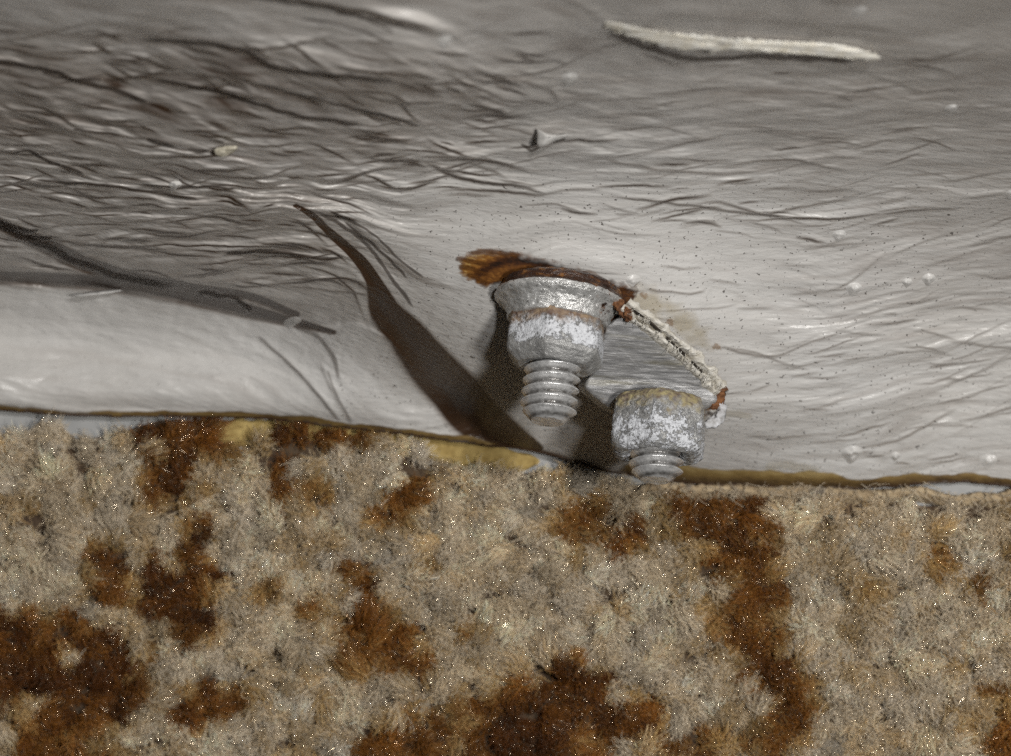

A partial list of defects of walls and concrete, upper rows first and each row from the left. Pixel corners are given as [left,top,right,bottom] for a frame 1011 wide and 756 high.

peeling [604,21,881,62]
corrosion [457,250,555,287]
corrosion [610,281,636,304]
peeling [615,299,727,396]
corrosion [705,402,727,429]